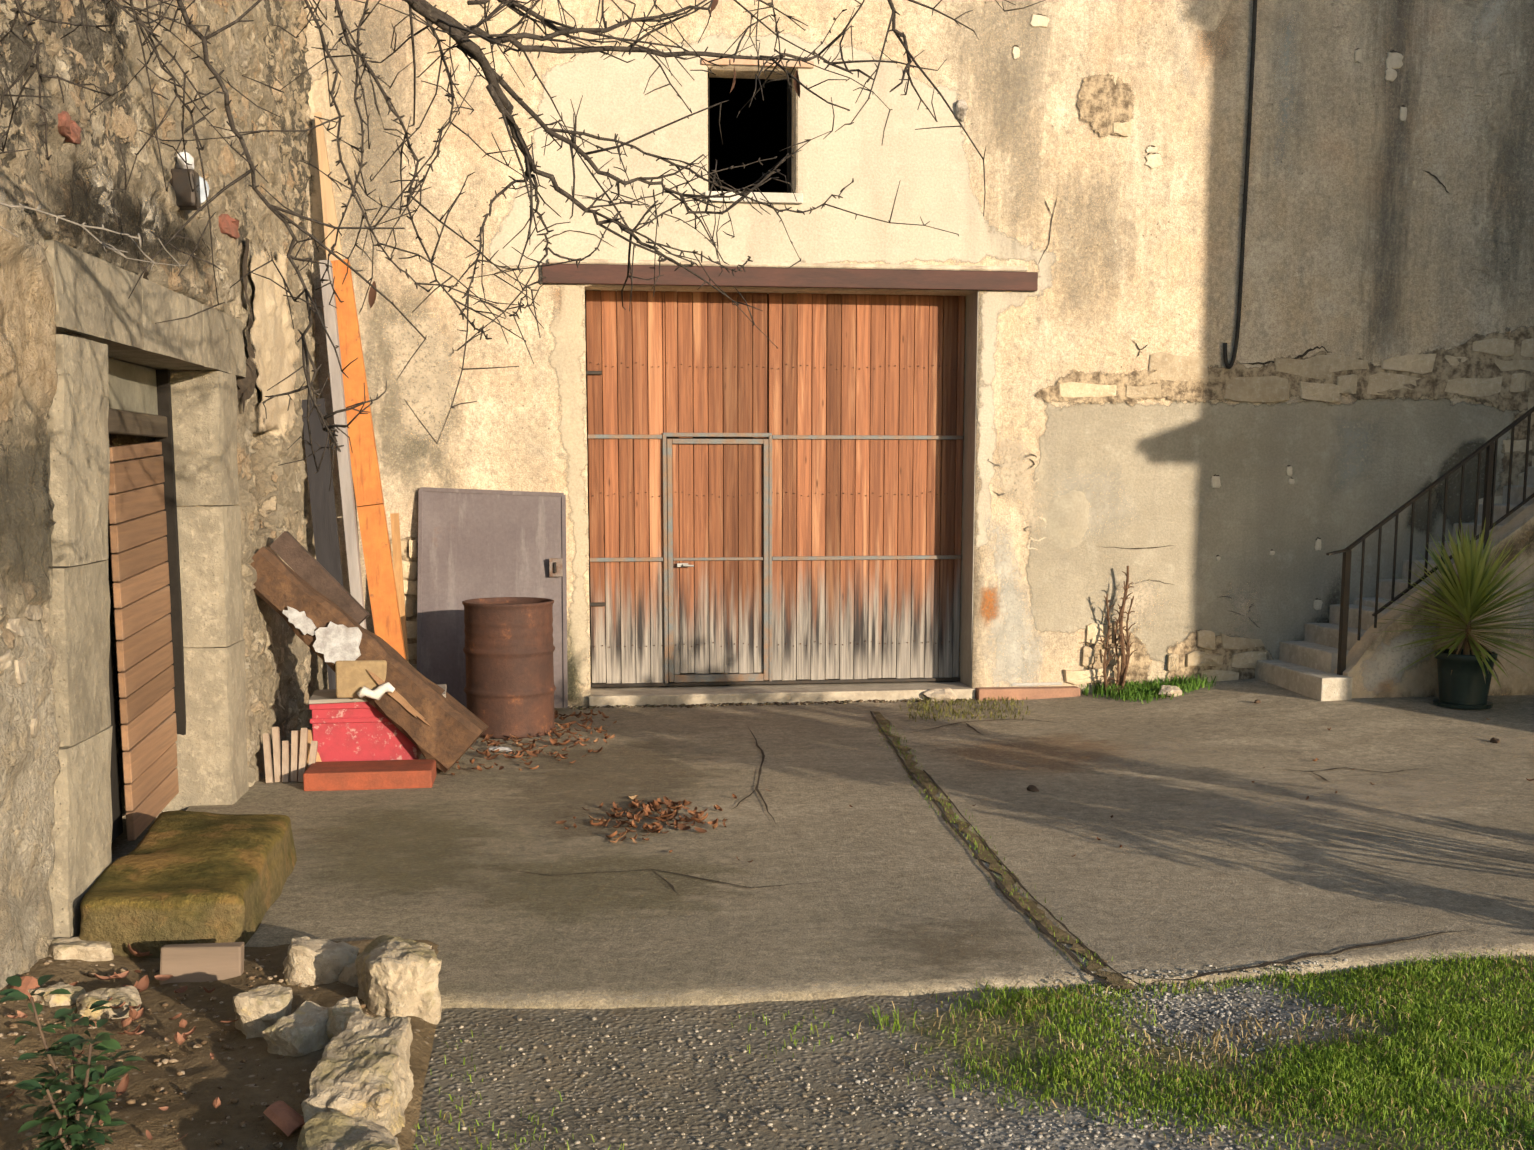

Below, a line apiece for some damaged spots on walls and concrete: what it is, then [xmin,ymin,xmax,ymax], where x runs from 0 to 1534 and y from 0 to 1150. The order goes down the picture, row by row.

spalling [1077,72,1135,137]
flaking render [1144,145,1163,169]
flaking render [1036,326,1534,508]
rust [982,590,996,621]
crack [731,730,776,824]
crack [487,866,825,895]